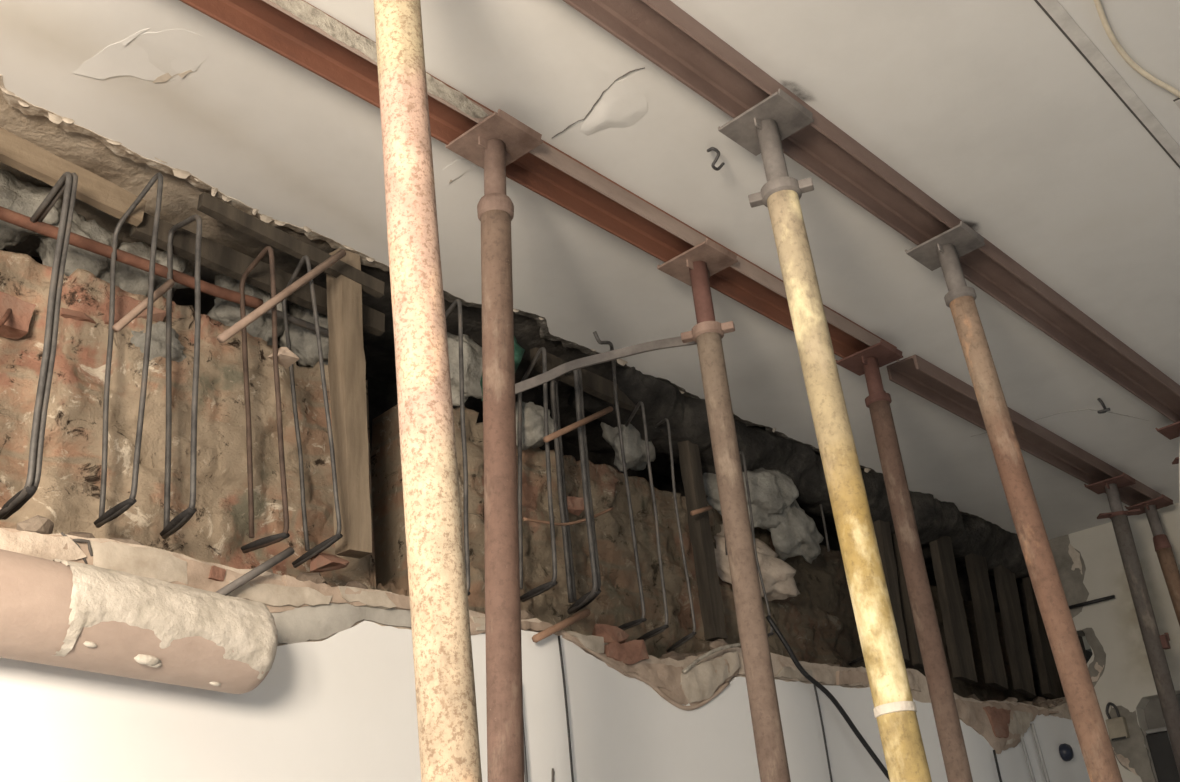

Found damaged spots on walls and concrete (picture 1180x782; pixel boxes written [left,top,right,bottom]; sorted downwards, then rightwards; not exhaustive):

peeling [73,28,211,83]
flaking render [0,75,412,645]
spalling [443,290,483,596]
flaking render [733,412,820,453]
flaking render [513,308,745,711]
spalling [817,504,841,552]
spalling [926,567,937,587]
flaking render [1049,535,1089,618]
flaking render [772,656,870,687]
flaking render [955,575,1065,754]
flaking render [1078,628,1106,687]
flaking render [1109,706,1157,782]